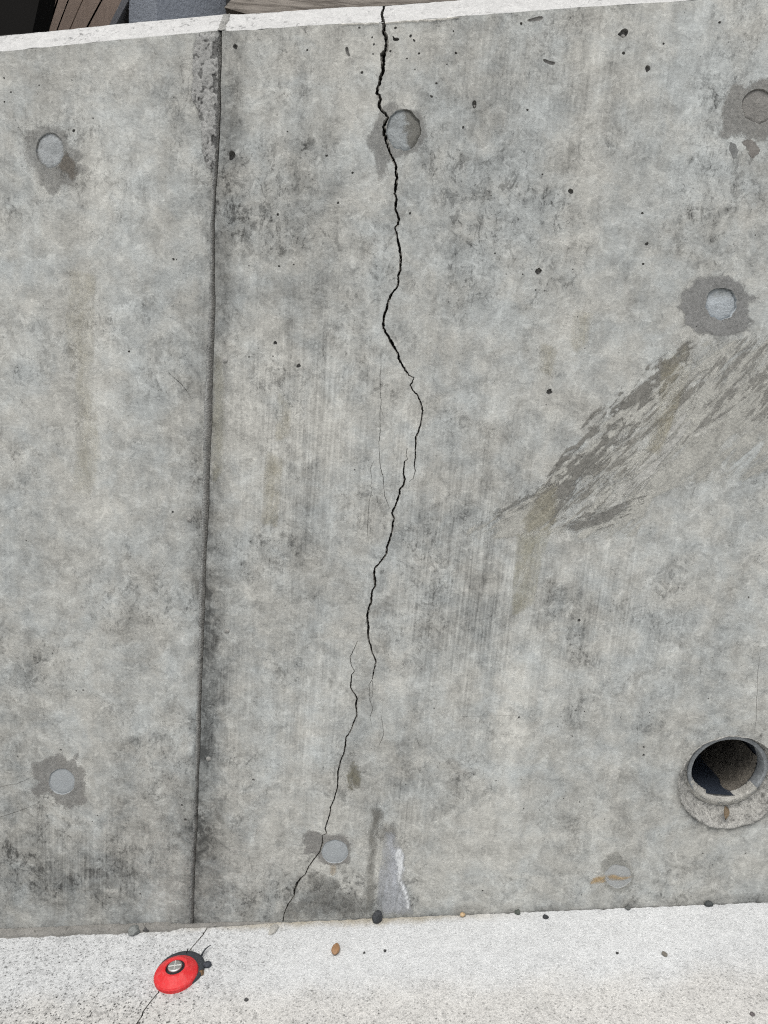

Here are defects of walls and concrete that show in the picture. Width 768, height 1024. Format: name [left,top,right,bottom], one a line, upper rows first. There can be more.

crack [282,9,424,921]
leakage [370,835,409,913]